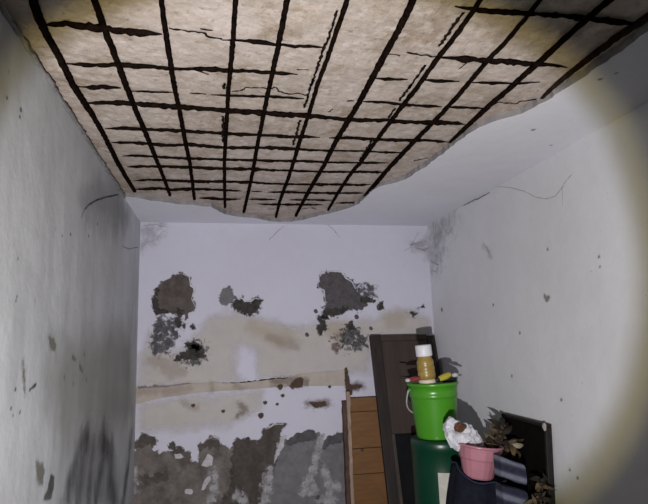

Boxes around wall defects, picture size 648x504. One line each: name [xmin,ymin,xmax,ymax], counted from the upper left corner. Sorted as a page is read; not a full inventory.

spalling [0,0,648,222]
crack [456,174,572,210]
peeling [150,272,196,356]
peeling [219,286,263,316]
water stain [141,313,429,385]
peeling [314,270,384,356]
water stain [142,393,260,429]
peeling [133,423,345,504]